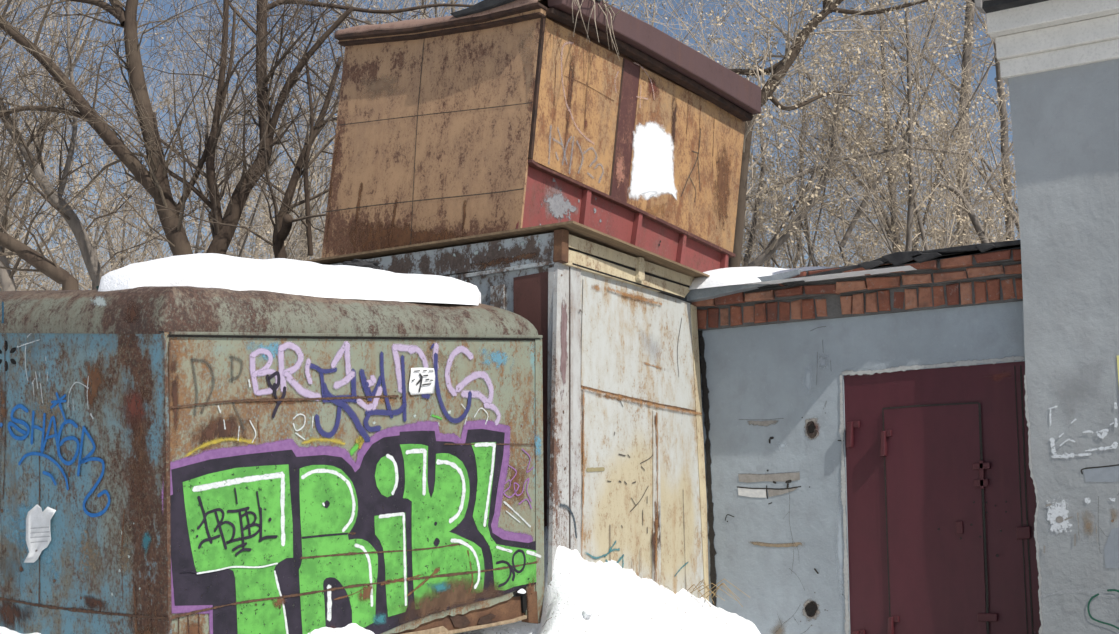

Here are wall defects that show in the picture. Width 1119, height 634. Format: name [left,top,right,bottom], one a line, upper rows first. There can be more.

corrosion [554,63,587,153]
corrosion [326,136,339,242]
corrosion [349,182,466,253]
corrosion [616,156,625,188]
corrosion [672,98,730,225]
corrosion [594,285,662,305]
corrosion [80,361,106,408]
corrosion [581,387,702,581]
corrosion [0,600,29,628]
corrosion [76,597,105,612]